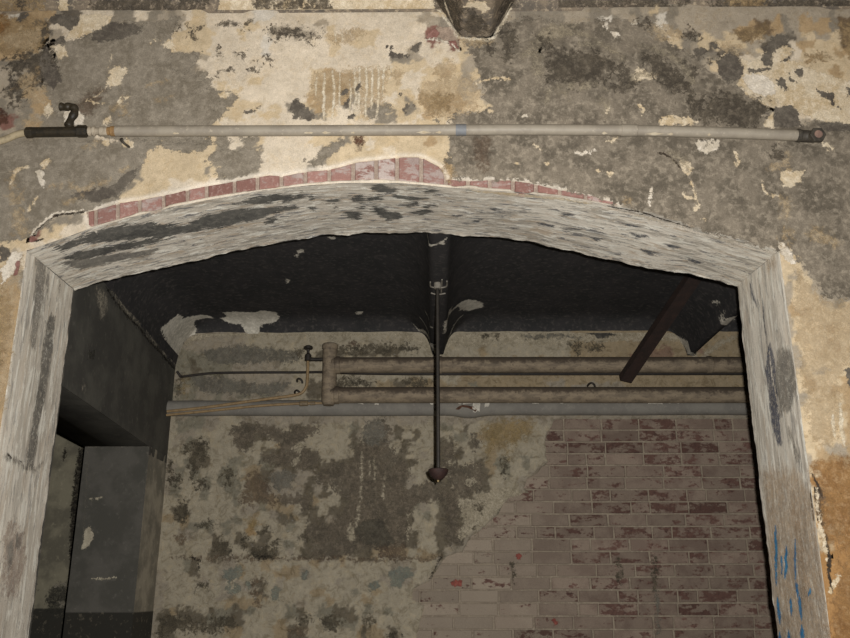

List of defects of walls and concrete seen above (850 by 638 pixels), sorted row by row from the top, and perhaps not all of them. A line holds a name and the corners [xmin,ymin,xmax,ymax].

damp [0,14,60,126]
damp [63,110,85,125]
damp [235,50,273,73]
damp [263,21,364,45]
damp [308,64,401,122]
damp [435,0,519,64]
damp [675,54,773,128]
peeling [0,0,850,300]
peeling [160,299,646,357]
flaking render [661,333,742,357]
damp [172,499,282,595]
flaking render [228,418,778,638]